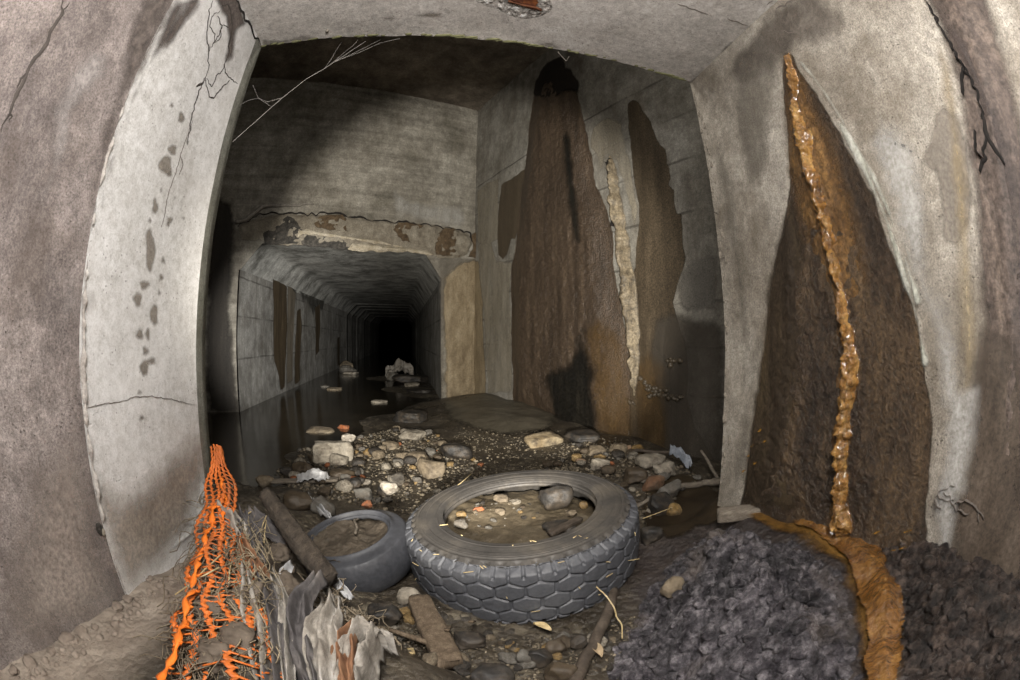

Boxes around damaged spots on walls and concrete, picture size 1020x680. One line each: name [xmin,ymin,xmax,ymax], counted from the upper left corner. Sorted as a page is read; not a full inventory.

crack [1,0,70,130]
crack [161,0,261,227]
leakage [840,125,890,214]
crack [925,0,1006,173]
crack [92,395,194,407]
leakage [137,305,157,375]
leakage [146,200,164,279]
spalling [239,213,476,258]
leakage [477,180,512,393]
leakage [591,100,723,461]
corrosion [741,52,932,551]
leakage [888,226,920,303]